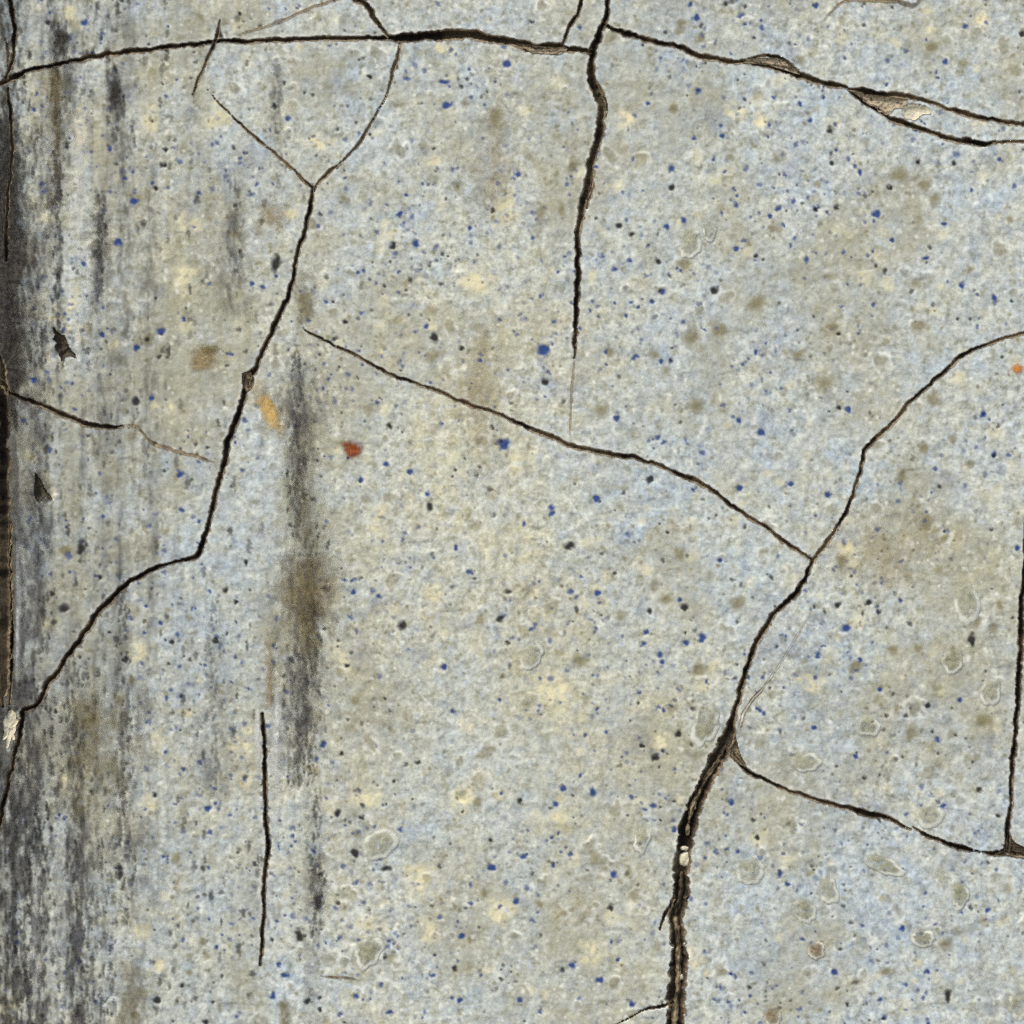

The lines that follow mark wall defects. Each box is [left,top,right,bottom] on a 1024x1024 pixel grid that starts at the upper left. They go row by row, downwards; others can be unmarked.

leakage [0,74,43,460]
leakage [57,32,68,49]
leakage [110,81,121,109]
crack [0,0,1024,358]
spalling [853,91,931,120]
crack [0,42,401,830]
leakage [17,497,44,655]
crack [259,714,271,966]
leakage [275,705,311,762]
crack [302,328,1024,1024]